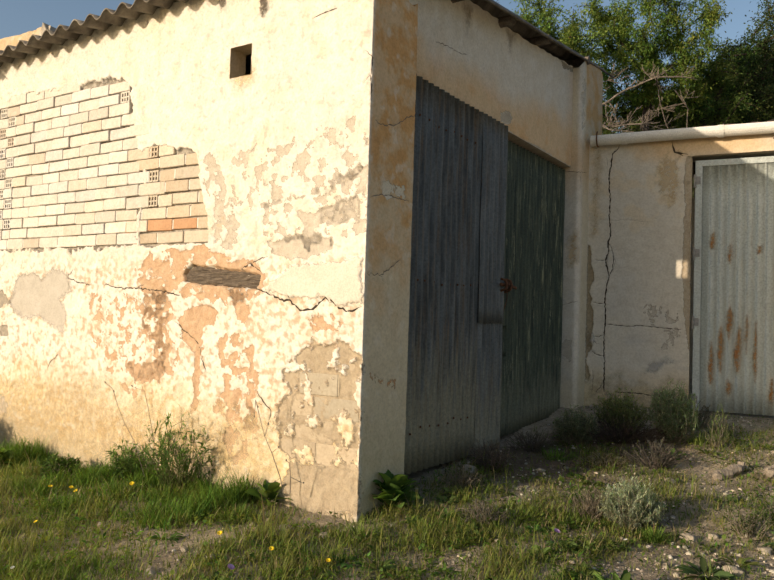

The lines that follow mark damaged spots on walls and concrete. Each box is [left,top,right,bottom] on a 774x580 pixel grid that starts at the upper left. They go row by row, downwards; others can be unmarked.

flaking render [0,77,369,415]
peeling [213,333,260,465]
crack [243,256,359,312]
crack [589,147,681,395]
corrosion [708,308,757,384]